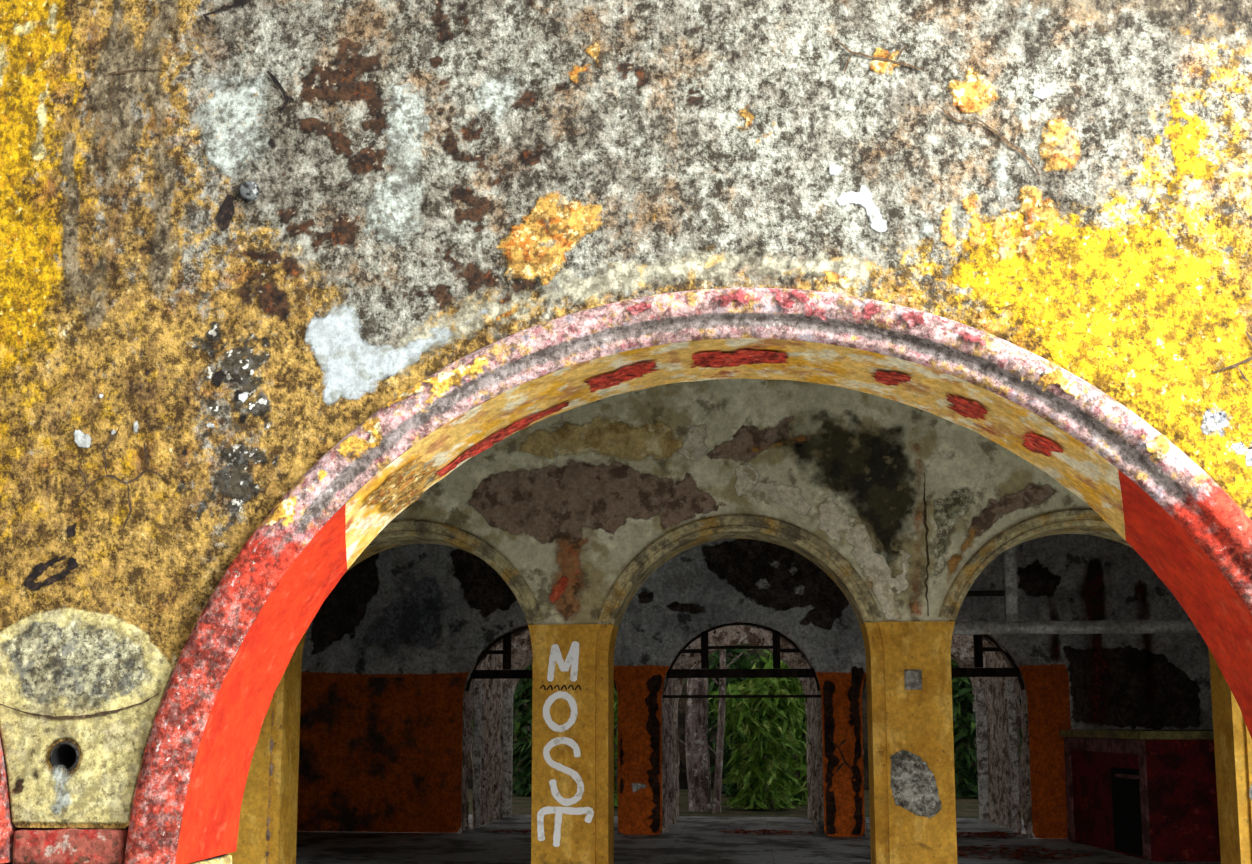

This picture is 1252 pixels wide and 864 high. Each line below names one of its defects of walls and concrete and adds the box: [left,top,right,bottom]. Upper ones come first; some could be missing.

peeling [192,0,1252,503]
peeling [266,491,297,526]
flaking render [366,402,707,544]
water stain [658,472,726,529]
water stain [707,411,917,565]
flaking render [734,435,911,619]
flaking render [934,483,1055,577]
peeling [311,553,463,656]
flaking render [450,548,517,622]
flaking render [701,539,849,630]
flaking render [1063,645,1201,730]
peeling [890,750,941,818]